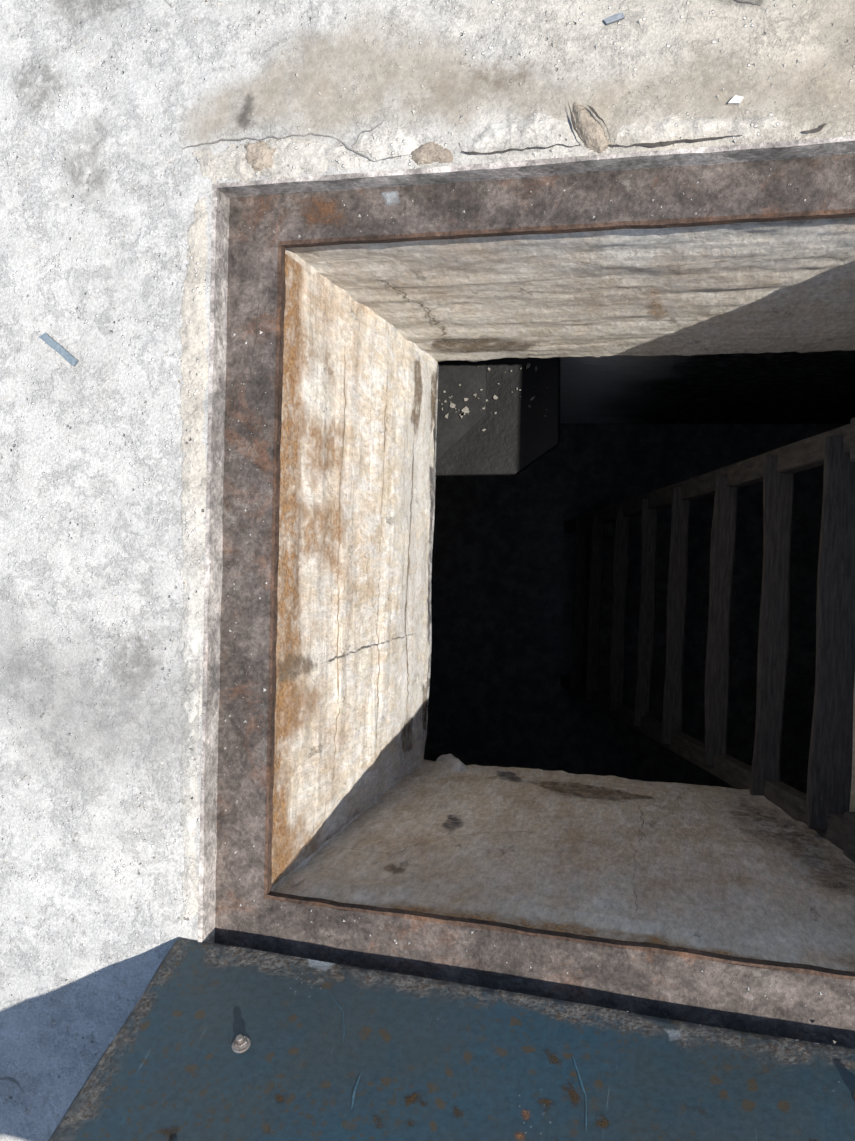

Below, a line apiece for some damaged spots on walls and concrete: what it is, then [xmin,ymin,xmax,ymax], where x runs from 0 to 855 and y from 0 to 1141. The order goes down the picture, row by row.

water stain [219,45,453,126]
crack [182,122,412,161]
crack [461,135,742,154]
crack [802,123,826,133]
crack [339,333,347,496]
crack [322,377,413,781]
corrosion [264,209,855,981]